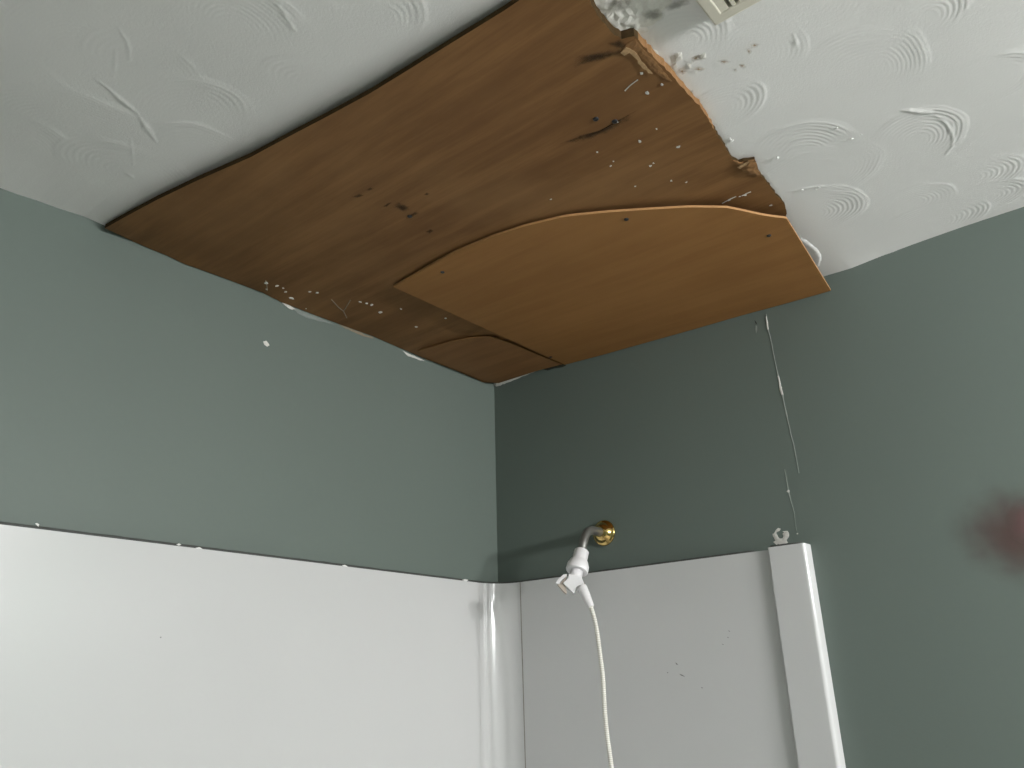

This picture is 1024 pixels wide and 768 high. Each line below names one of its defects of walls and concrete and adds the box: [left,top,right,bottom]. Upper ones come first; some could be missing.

flaking render [594,0,673,34]
peeling [264,281,382,338]
crack [766,315,799,534]